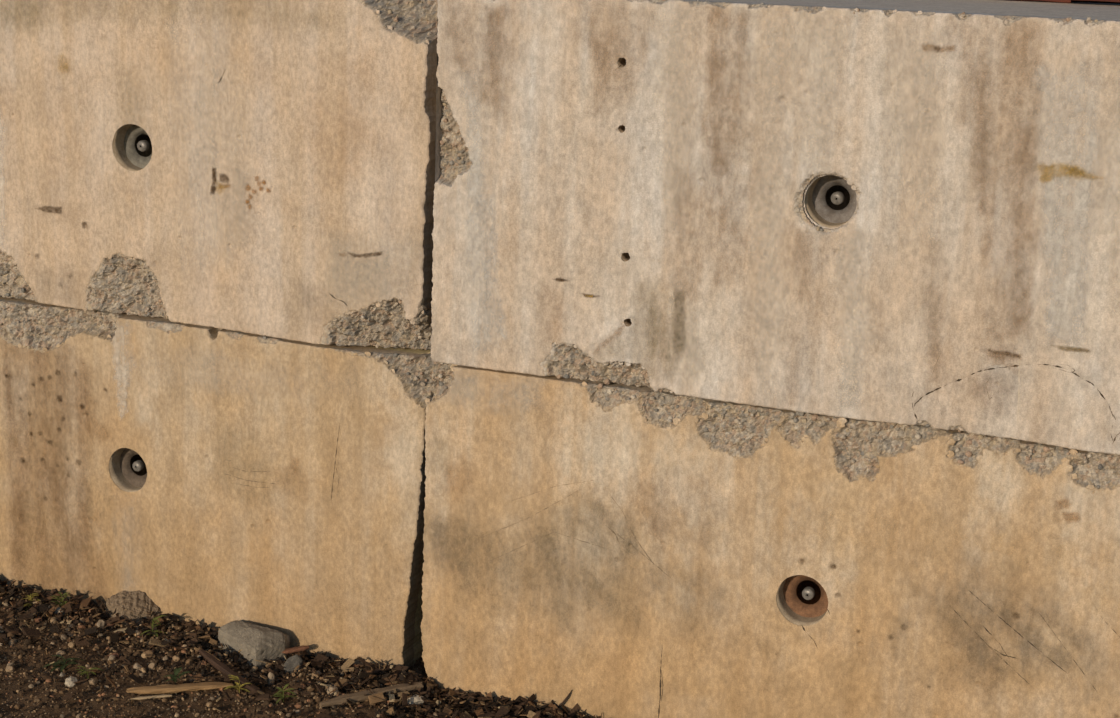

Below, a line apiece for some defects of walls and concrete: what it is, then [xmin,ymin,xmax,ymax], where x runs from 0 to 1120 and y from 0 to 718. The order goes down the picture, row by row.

spalling [355,0,438,46]
spalling [437,87,473,187]
spalling [0,249,189,353]
spalling [319,297,458,409]
spalling [540,342,1120,494]